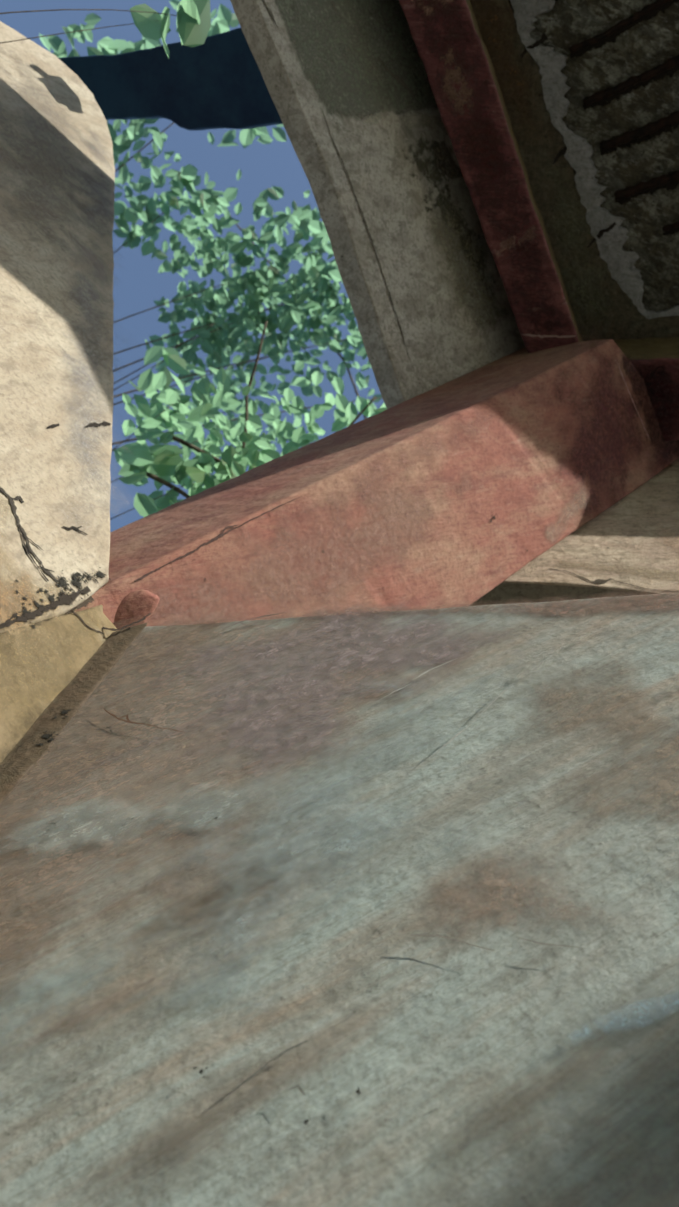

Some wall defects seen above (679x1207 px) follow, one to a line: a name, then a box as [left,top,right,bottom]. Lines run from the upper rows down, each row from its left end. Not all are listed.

spalling [509,0,679,319]
crack [0,487,152,636]
crack [549,568,679,592]